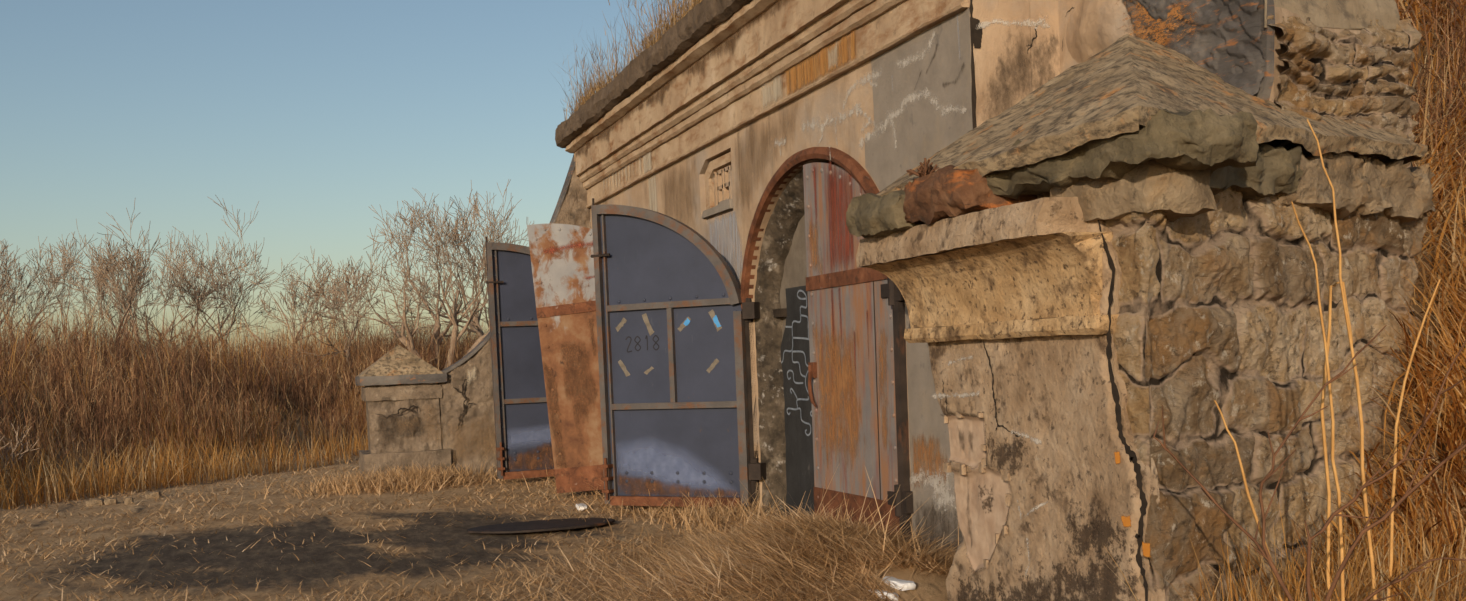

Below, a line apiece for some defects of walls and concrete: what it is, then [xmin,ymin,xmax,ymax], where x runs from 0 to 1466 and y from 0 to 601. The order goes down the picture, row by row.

crack [969,0,977,129]
crack [1027,7,1075,53]
rust [814,162,861,268]
rust [508,321,597,470]
water stain [910,436,960,559]
crack [983,339,1021,437]
water stain [987,430,1042,481]
crack [1097,220,1148,601]
water stain [953,503,1136,601]